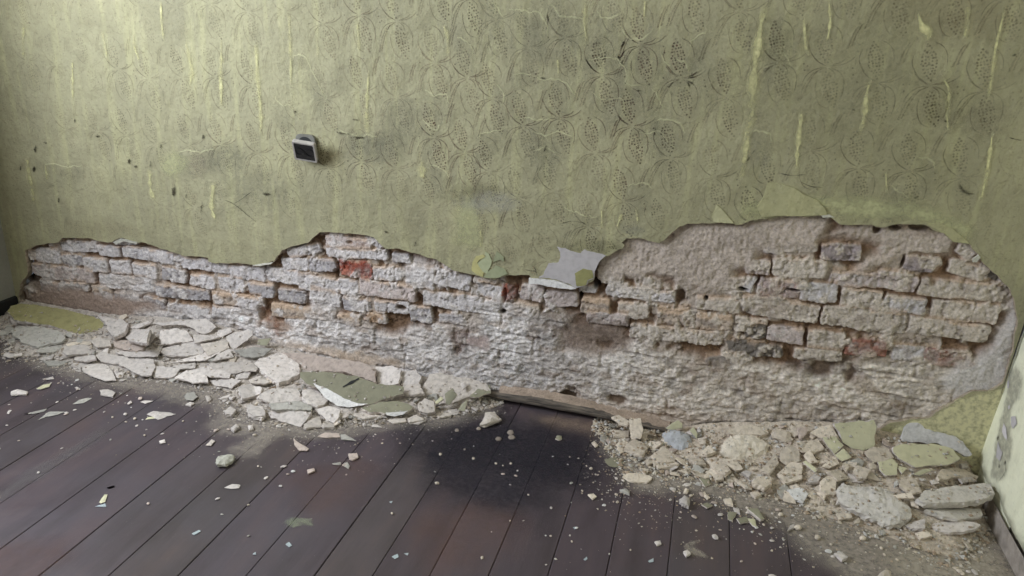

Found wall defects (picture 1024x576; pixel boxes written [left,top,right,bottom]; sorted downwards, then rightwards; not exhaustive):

peeling [11,383,51,396]
flaking render [18,182,1018,429]